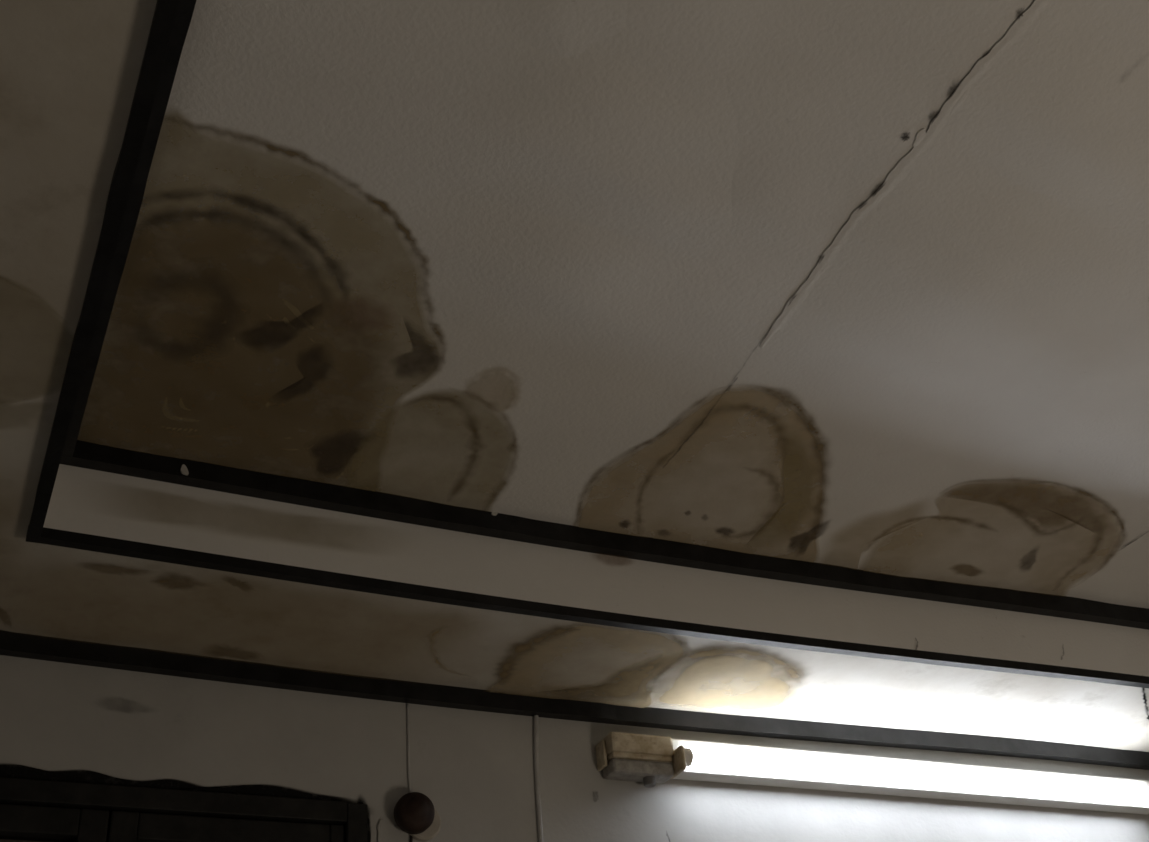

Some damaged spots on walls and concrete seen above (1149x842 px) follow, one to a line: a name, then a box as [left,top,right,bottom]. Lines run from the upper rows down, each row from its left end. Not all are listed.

leakage [77,136,516,497]
leakage [579,389,826,562]
leakage [490,626,802,710]